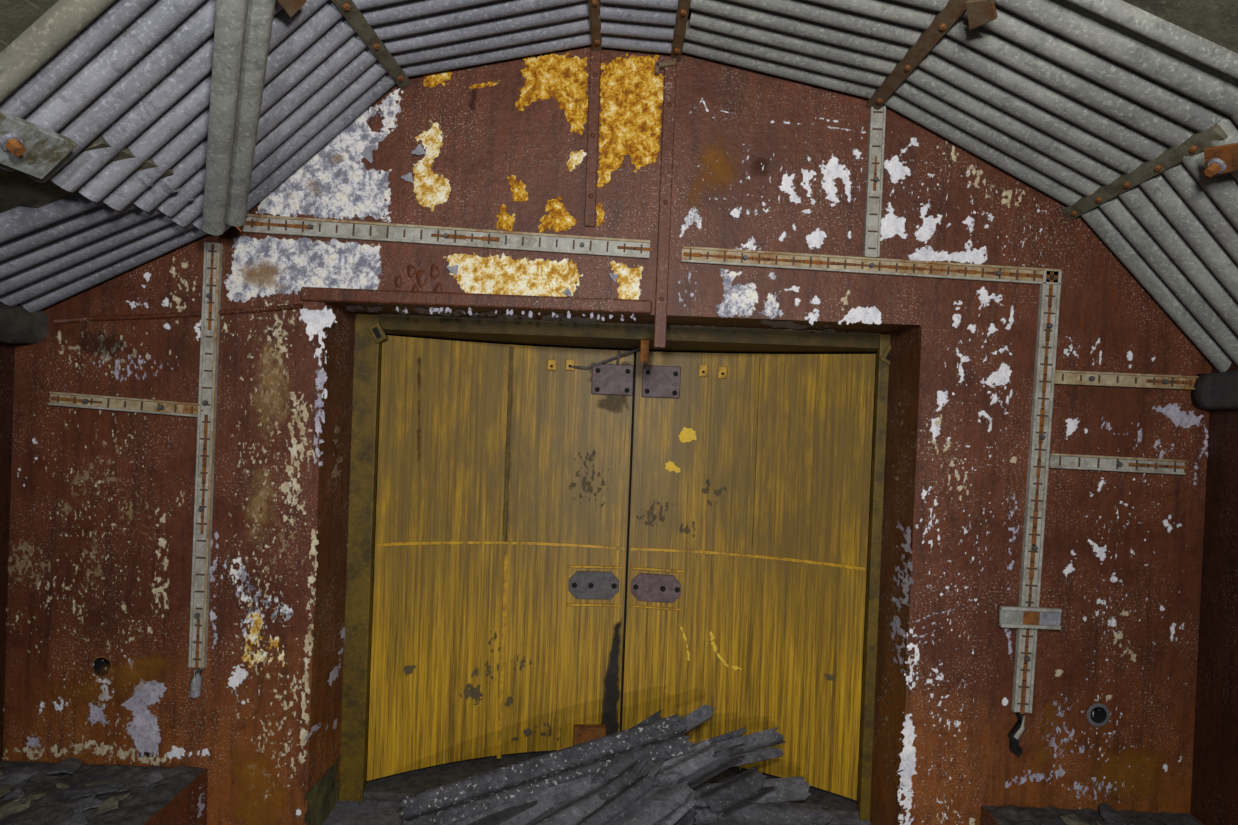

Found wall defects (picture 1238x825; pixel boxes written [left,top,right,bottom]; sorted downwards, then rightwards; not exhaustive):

corrosion [242,263,277,286]
peeling [256,85,451,223]
peeling [515,52,664,188]
peeling [698,139,866,218]
peeling [685,268,882,332]
peeling [779,224,827,249]
peeling [880,138,1046,264]
peeling [2,410,210,766]
peeling [210,235,643,797]
peeling [877,286,1019,825]
peeling [1005,471,1155,809]
corrosion [236,761,282,825]